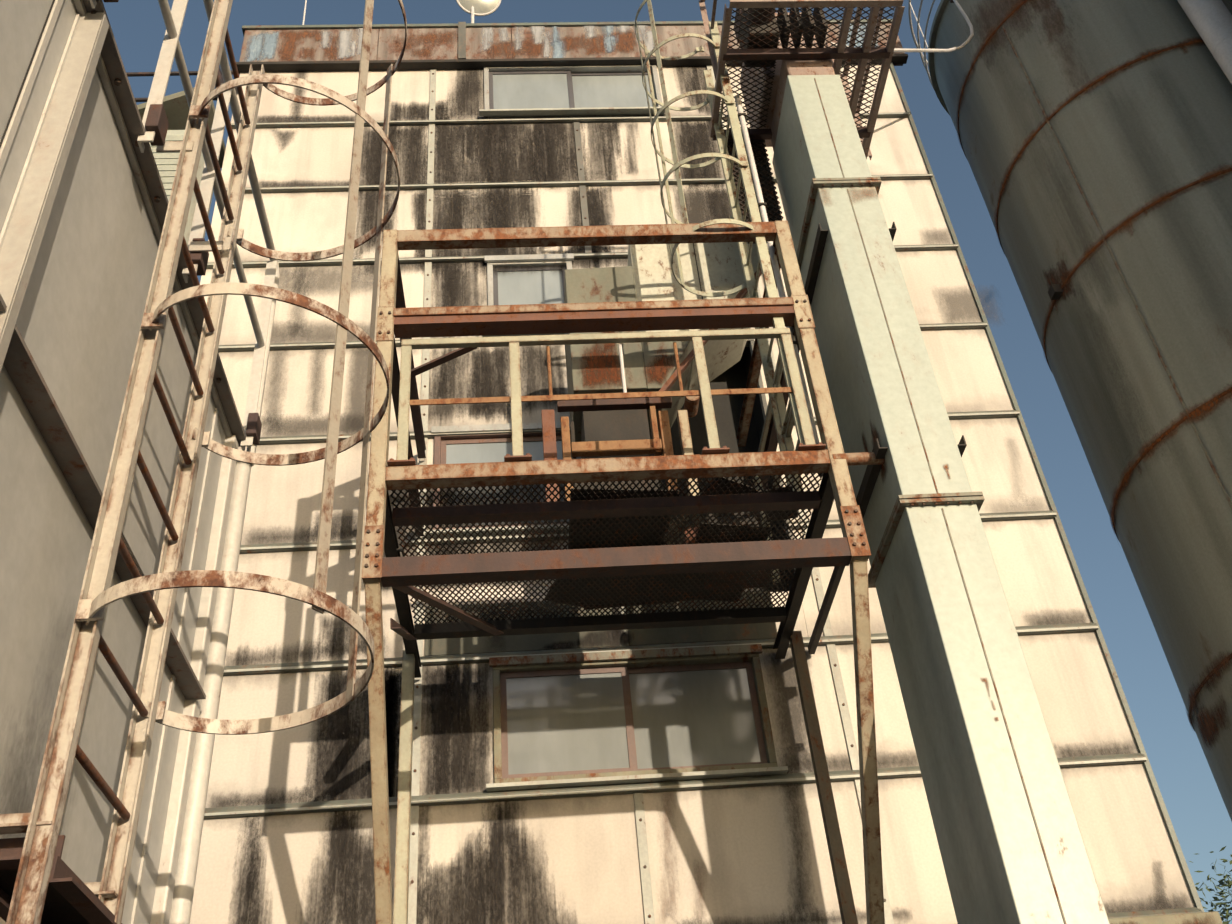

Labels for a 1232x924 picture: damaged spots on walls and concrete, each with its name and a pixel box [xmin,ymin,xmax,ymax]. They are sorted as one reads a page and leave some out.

corrosion [280,30,340,61]
corrosion [487,31,636,59]
leakage [257,69,635,271]
leakage [675,66,732,224]
corrosion [994,37,1204,241]
corrosion [581,332,622,388]
corrosion [646,354,675,383]
corrosion [1110,386,1232,537]
leakage [212,674,376,924]
leakage [384,669,402,797]
leakage [421,663,490,795]
leakage [416,801,563,924]